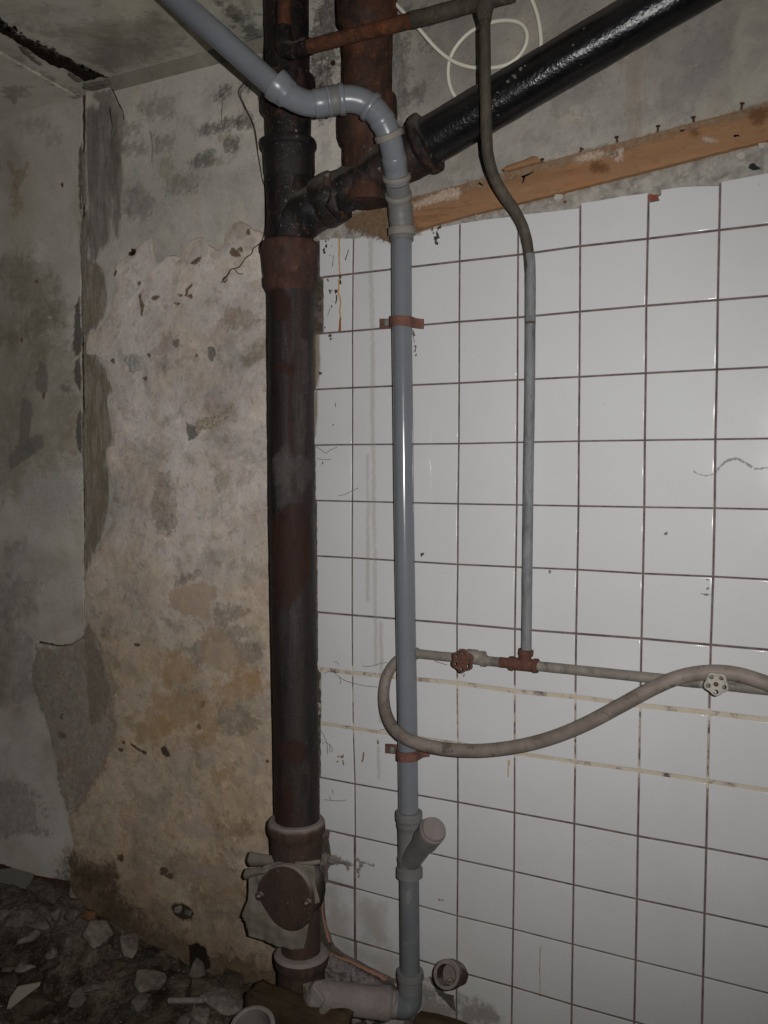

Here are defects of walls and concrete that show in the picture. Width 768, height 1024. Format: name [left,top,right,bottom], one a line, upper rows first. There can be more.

spalling [314,222,371,335]
spalling [419,135,768,232]
water stain [84,348,112,570]
flaking render [33,144,278,985]